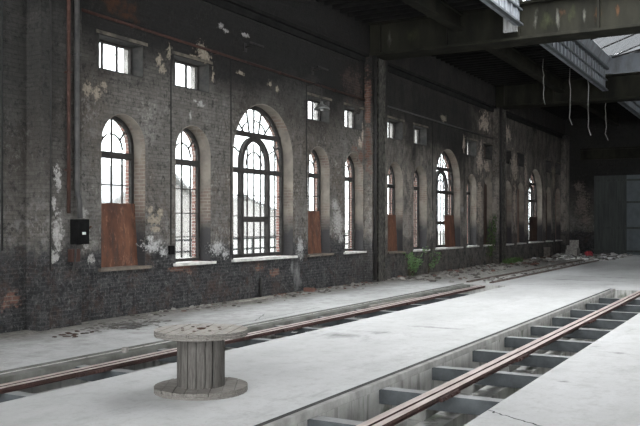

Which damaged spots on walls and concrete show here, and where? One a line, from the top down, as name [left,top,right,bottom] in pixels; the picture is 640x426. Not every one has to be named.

flaking render [155,42,173,75]
flaking render [189,38,215,83]
flaking render [82,78,107,103]
peeling [51,161,66,267]
rust [101,203,138,267]
rust [308,211,321,254]
rust [444,215,455,247]